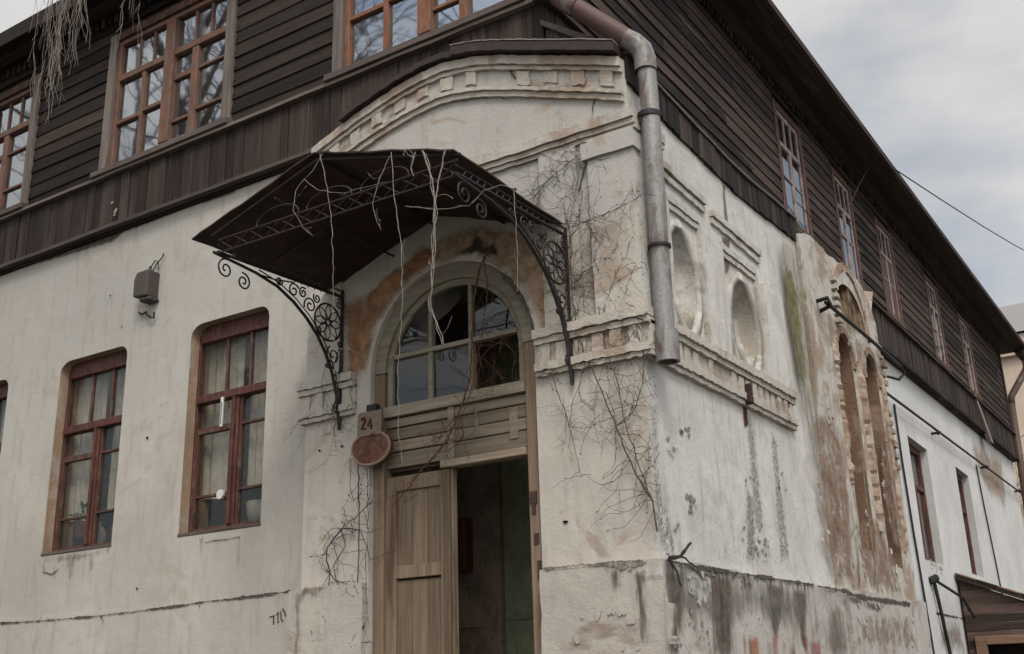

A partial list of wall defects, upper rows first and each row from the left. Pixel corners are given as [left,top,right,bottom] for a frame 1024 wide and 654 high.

peeling [347,227,545,372]
spalling [817,406,919,654]
crack [0,590,291,625]
peeling [687,571,713,644]
leakage [666,568,806,654]